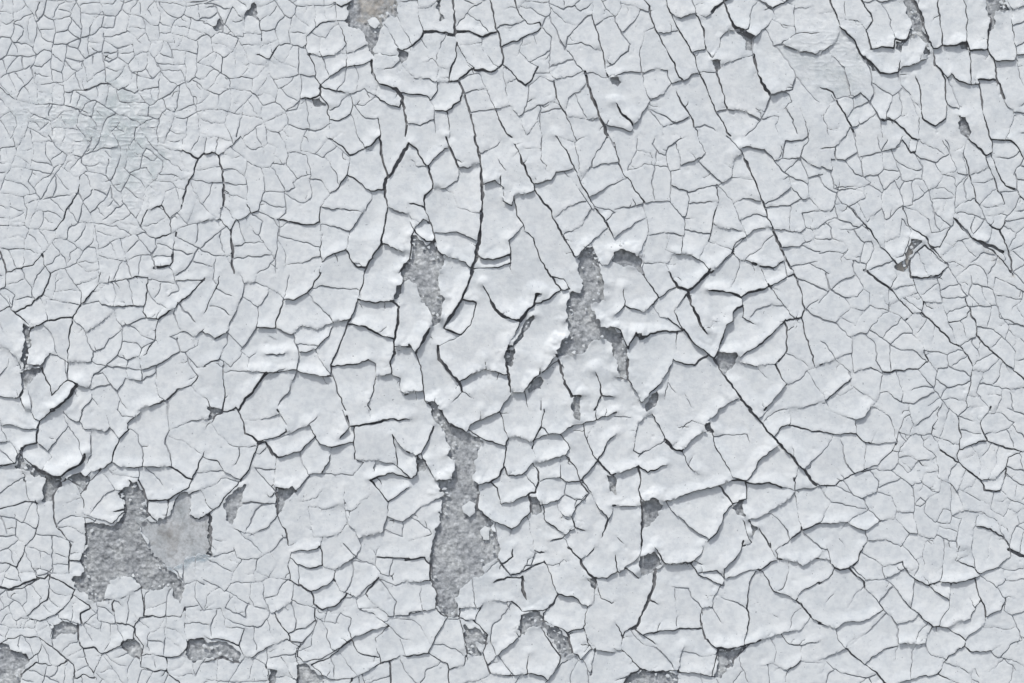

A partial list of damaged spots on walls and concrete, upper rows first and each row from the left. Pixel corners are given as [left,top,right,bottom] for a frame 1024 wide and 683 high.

peeling [324,0,445,99]
crack [853,0,910,50]
peeling [0,427,297,683]
crack [370,427,434,537]
crack [439,344,665,604]
peeling [354,181,758,683]
crack [633,414,698,474]
crack [695,424,750,471]
crack [666,449,783,541]
crack [471,512,1024,683]
crack [825,378,868,405]
crack [962,497,1024,558]